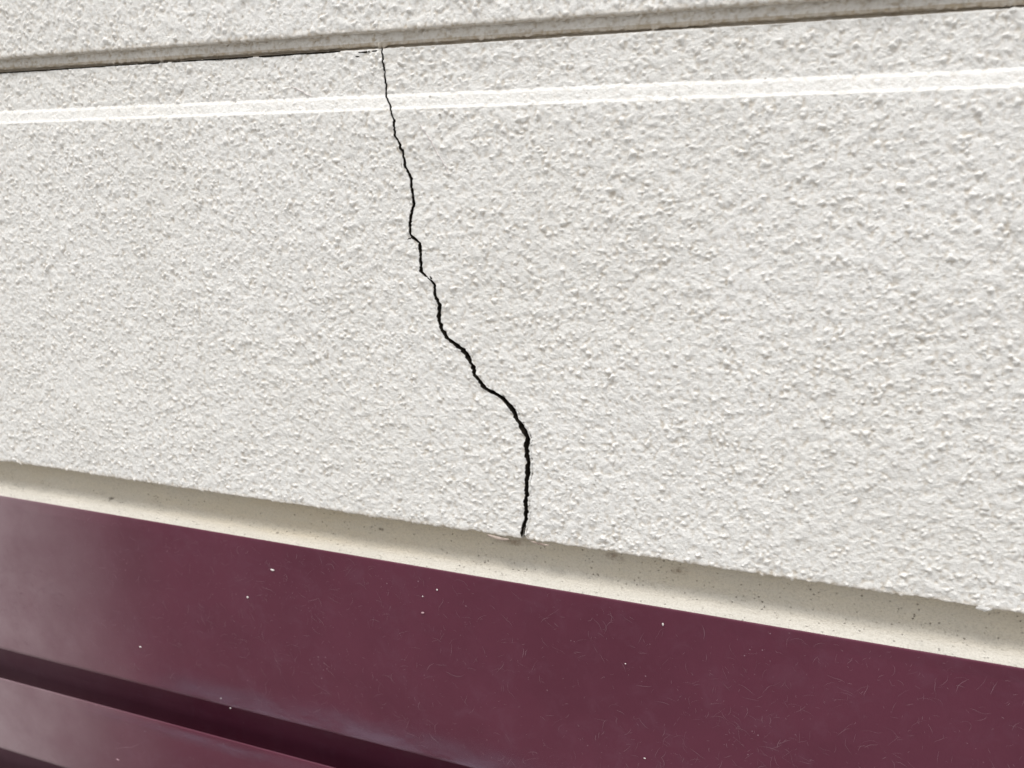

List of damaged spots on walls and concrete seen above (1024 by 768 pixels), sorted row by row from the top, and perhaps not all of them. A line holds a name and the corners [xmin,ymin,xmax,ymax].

crack [381,49,531,537]